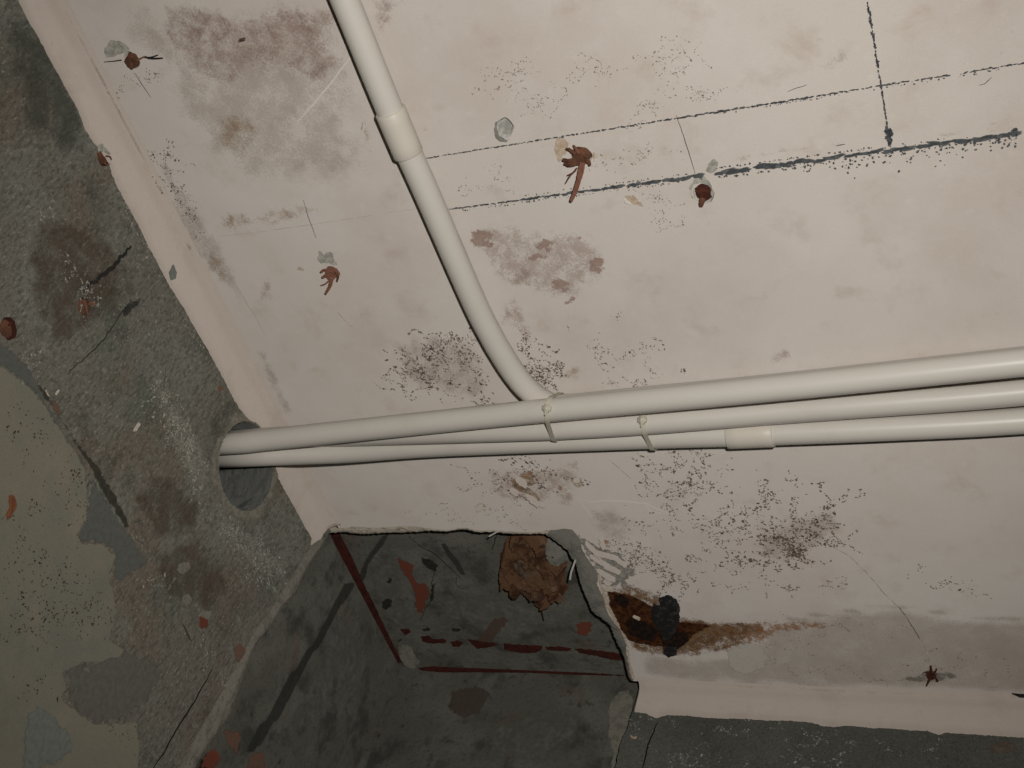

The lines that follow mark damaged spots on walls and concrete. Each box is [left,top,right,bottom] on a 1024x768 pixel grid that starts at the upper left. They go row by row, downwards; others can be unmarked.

crack [83,245,132,292]
leakage [471,230,493,247]
leakage [529,240,553,261]
leakage [553,280,575,304]
leakage [590,258,603,274]
crack [69,300,131,371]
leakage [374,327,495,406]
leakage [451,454,589,531]
spalling [0,509,119,653]
spalling [330,525,636,681]
leakage [599,448,866,656]